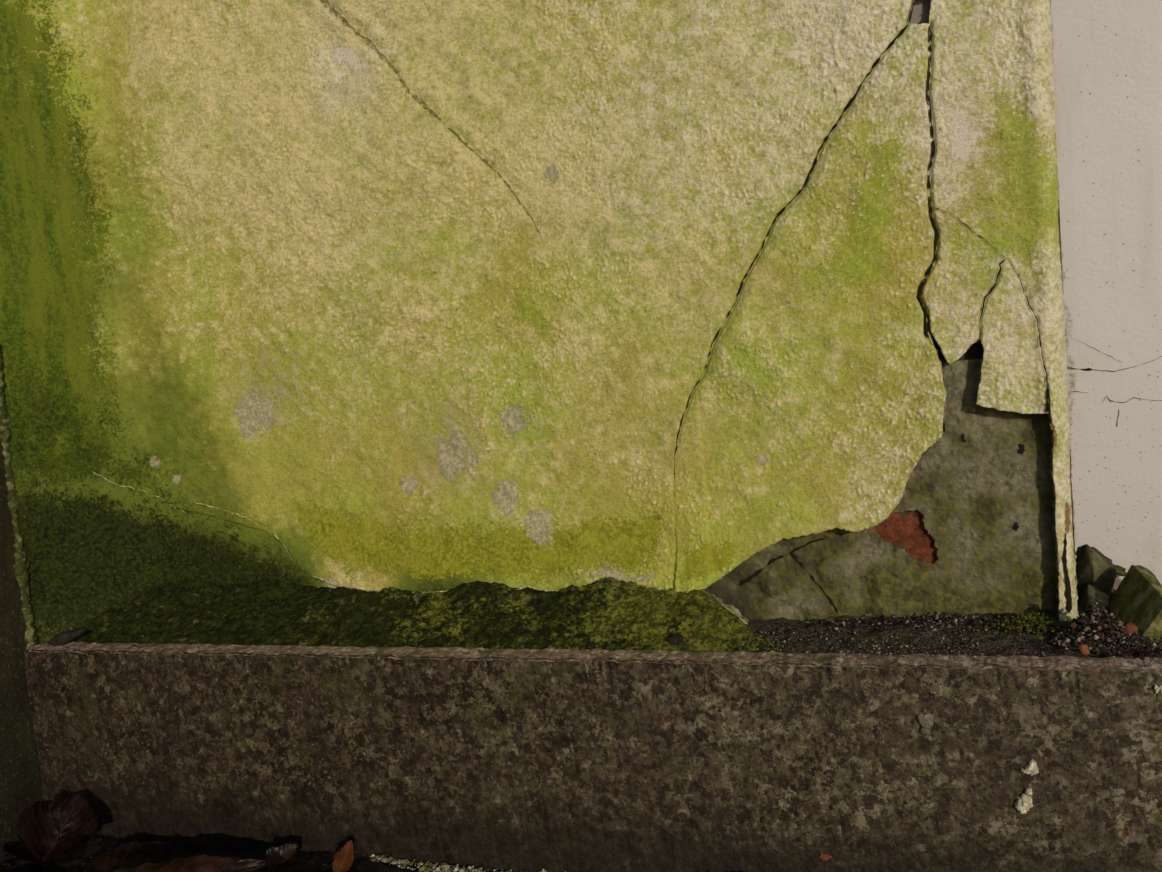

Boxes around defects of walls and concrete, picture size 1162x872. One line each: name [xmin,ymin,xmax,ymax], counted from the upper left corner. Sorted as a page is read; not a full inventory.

spalling [705,359,1059,621]
crack [674,2,1162,497]